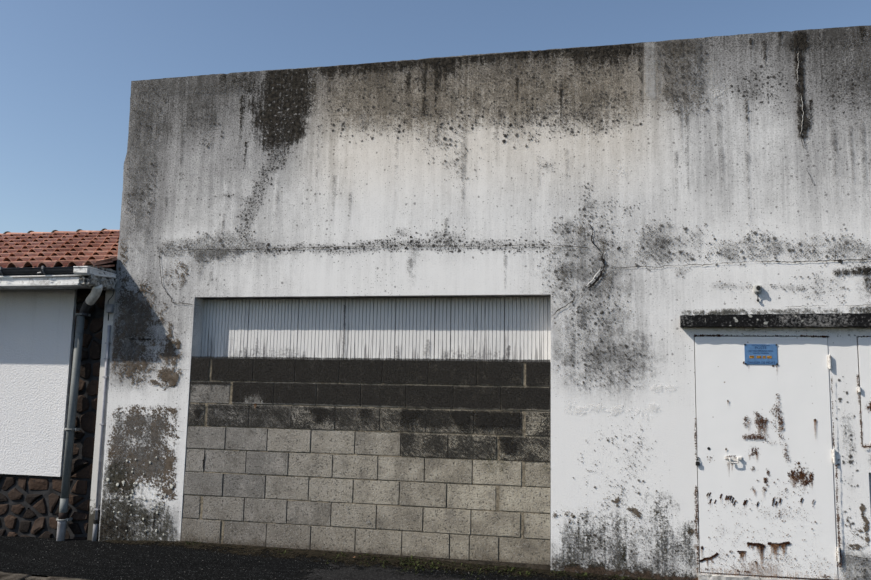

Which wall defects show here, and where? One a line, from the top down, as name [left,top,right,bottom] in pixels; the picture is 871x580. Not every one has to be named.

crack [127,246,389,306]
water stain [124,26,871,462]
crack [422,223,871,317]
water stain [835,376,859,487]
water stain [99,459,219,544]
water stain [533,495,699,580]
rust [693,394,842,580]